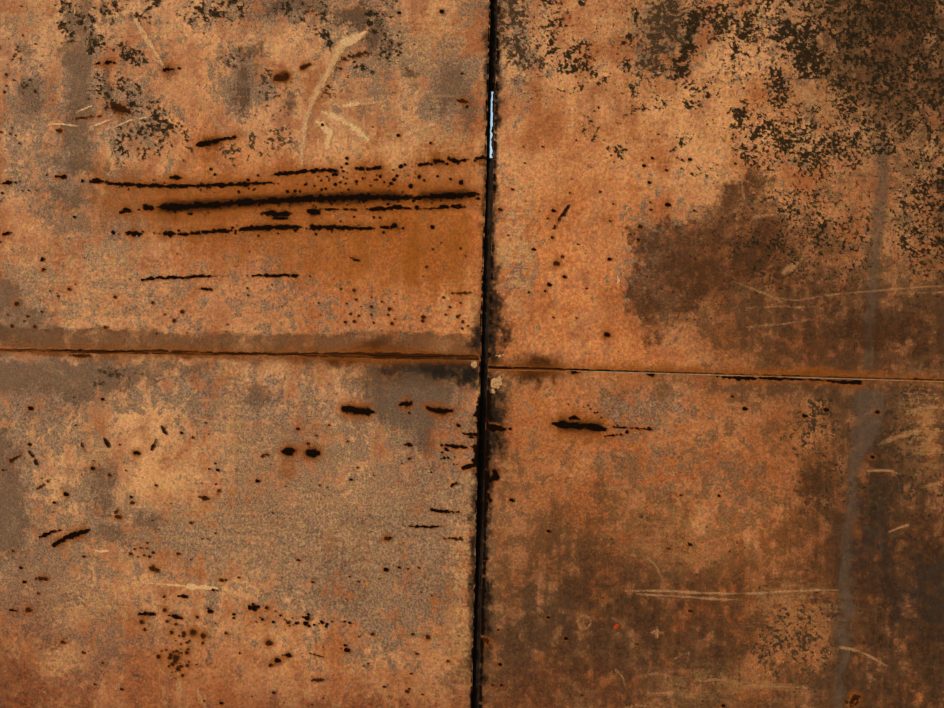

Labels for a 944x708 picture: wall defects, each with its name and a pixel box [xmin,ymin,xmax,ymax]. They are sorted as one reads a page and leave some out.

corrosion [0,0,702,708]
damp [620,167,929,358]